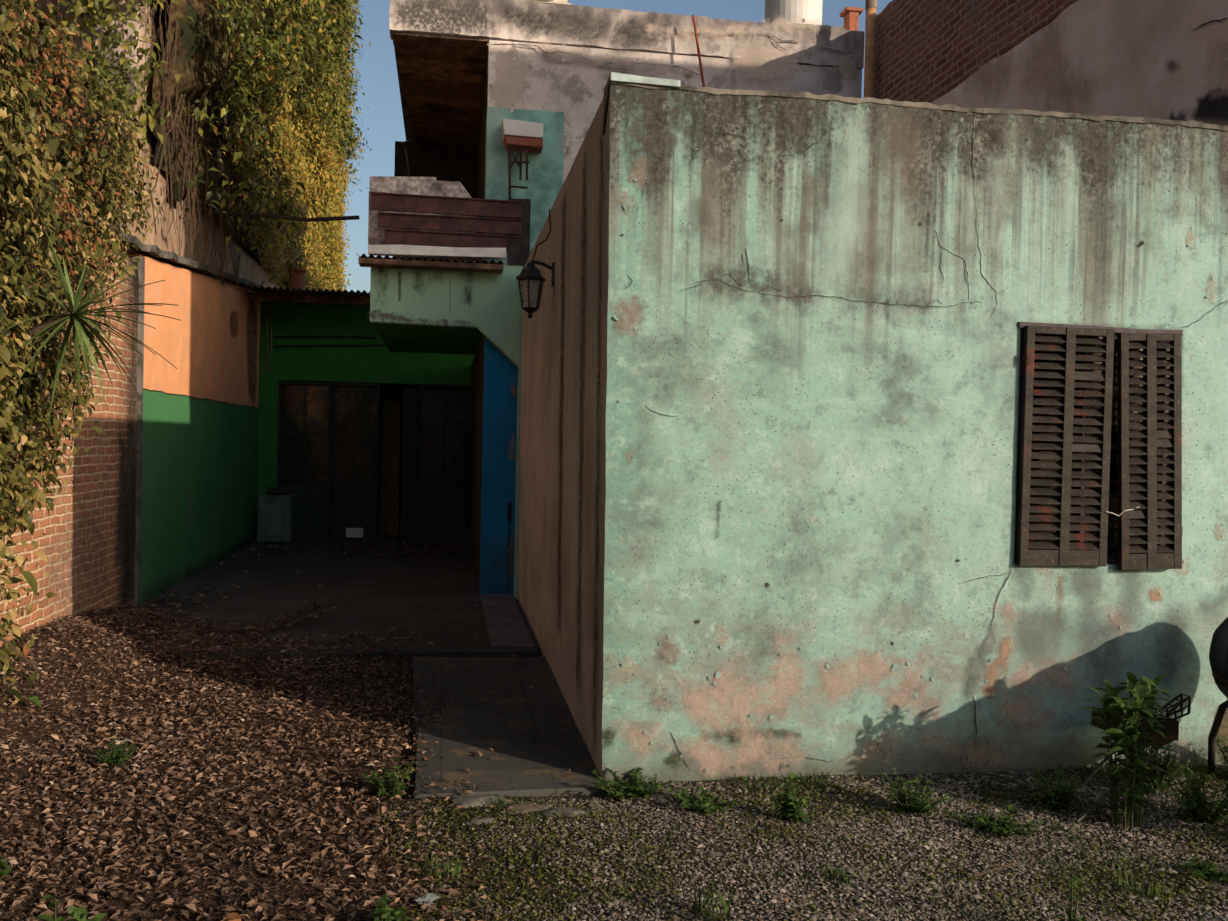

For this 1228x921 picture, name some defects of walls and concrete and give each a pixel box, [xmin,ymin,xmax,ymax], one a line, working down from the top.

leakage [625,88,743,194]
crack [680,105,998,316]
leakage [709,269,812,302]
crack [1165,299,1228,330]
crack [958,569,1012,626]
peeling [821,650,940,718]
peeling [680,734,806,775]
crack [968,696,984,767]
peeling [1216,708,1228,757]